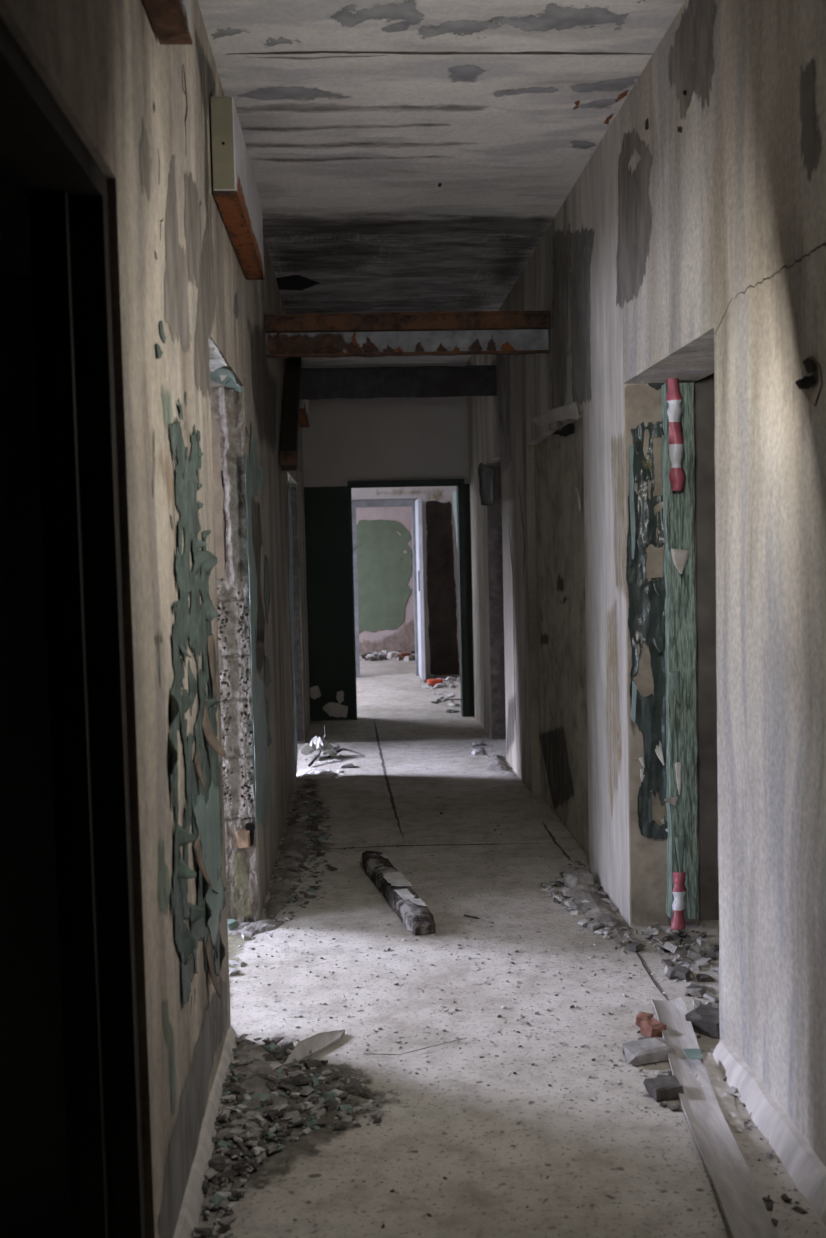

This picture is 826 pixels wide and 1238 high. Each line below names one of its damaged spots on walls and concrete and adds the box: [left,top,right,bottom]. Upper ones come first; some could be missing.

damp [239,87,348,111]
damp [450,65,484,82]
damp [495,87,557,97]
damp [572,77,638,108]
corrosion [214,179,265,281]
damp [616,130,653,309]
peeling [156,321,166,359]
damp [263,213,595,432]
crack [715,242,826,335]
peeling [158,340,272,1008]
peeling [625,382,698,925]